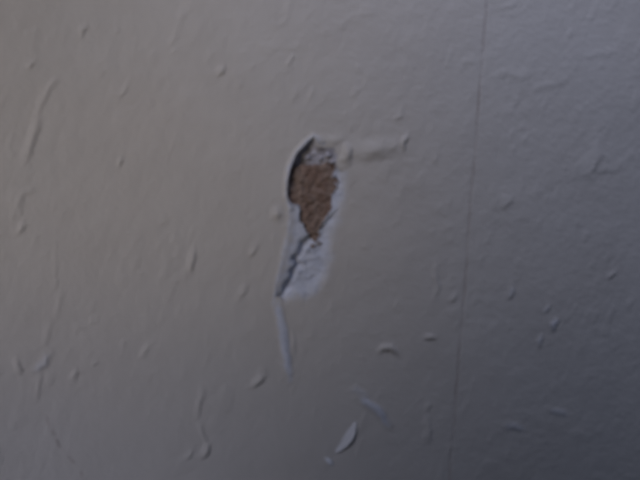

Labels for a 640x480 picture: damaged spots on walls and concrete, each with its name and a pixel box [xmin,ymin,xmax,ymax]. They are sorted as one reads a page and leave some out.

flaking render [265,127,356,318]
peeling [335,421,356,453]